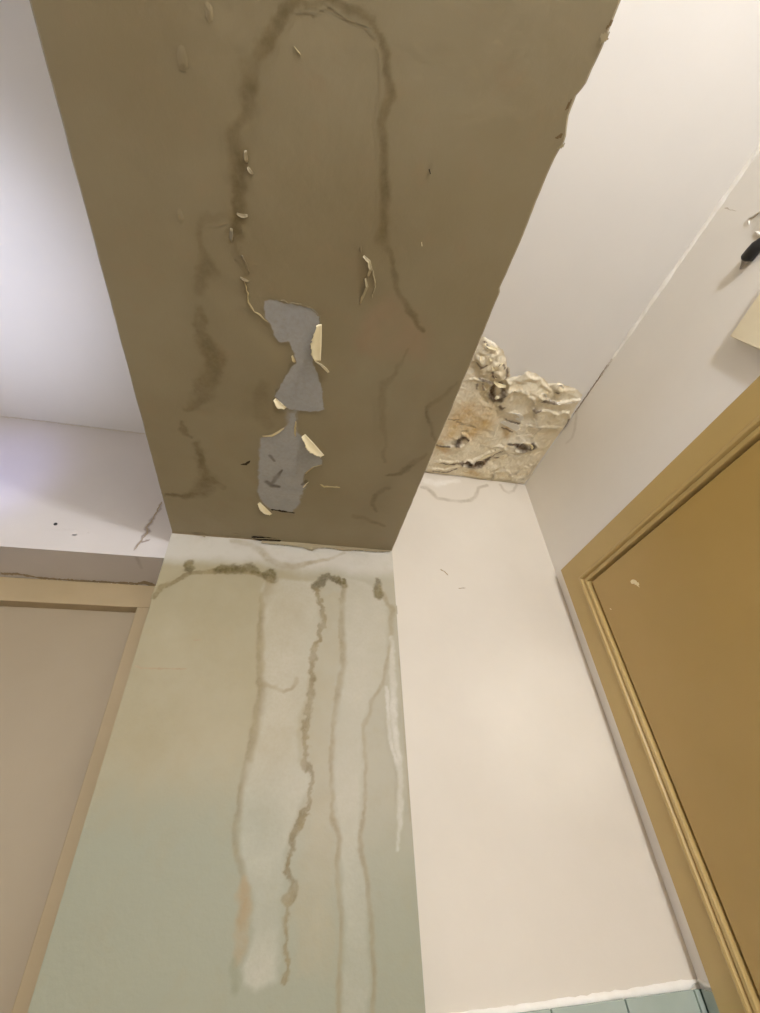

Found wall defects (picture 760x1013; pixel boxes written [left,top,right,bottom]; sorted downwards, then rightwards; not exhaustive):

damp [162,0,428,502]
peeling [359,246,376,304]
peeling [240,282,340,516]
damp [349,346,519,528]
peeling [425,336,583,484]
damp [151,538,411,1013]